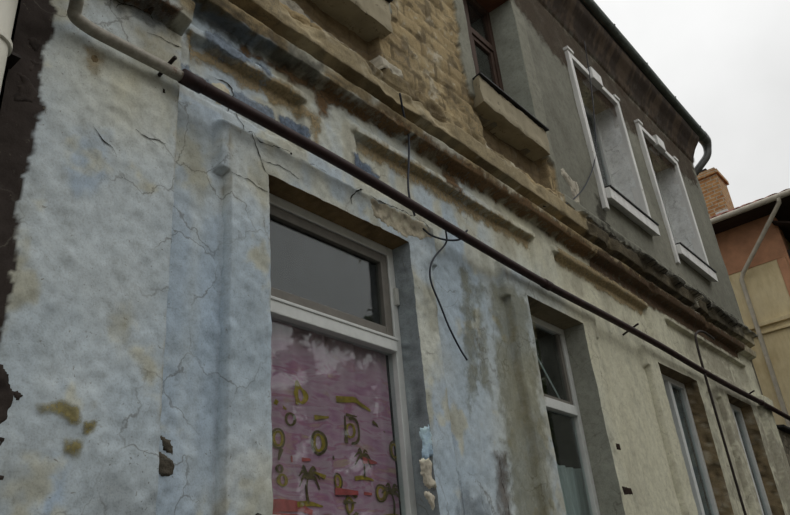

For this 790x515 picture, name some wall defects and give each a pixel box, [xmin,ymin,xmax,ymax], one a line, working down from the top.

crack [117,1,181,48]
peeling [205,31,271,75]
crack [214,77,299,191]
peeling [234,91,311,138]
crack [350,189,430,229]
peeling [0,364,23,424]
water stain [41,400,96,434]
water stain [65,440,82,454]
peeling [419,425,437,510]